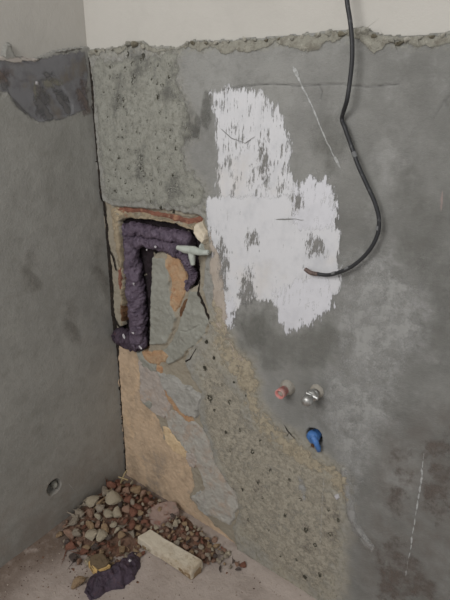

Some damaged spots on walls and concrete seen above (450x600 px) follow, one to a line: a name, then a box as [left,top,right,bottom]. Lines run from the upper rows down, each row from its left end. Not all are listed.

flaking render [88,20,450,249]
crack [224,84,398,95]
crack [197,281,210,320]
flaking render [118,346,342,589]